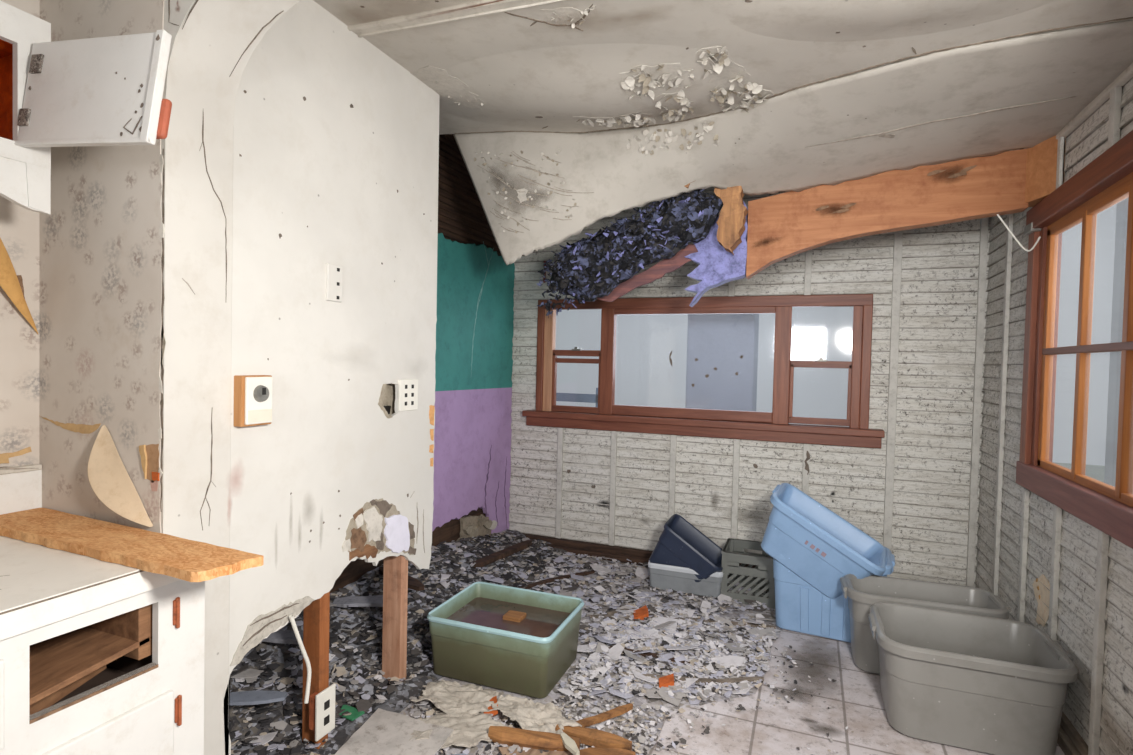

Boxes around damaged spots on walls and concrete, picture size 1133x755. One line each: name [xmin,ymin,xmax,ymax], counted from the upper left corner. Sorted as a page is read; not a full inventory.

peeling [574,46,774,156]
crack [199,112,227,295]
peeling [139,445,163,491]
spalling [338,492,425,561]
spalling [457,445,507,541]